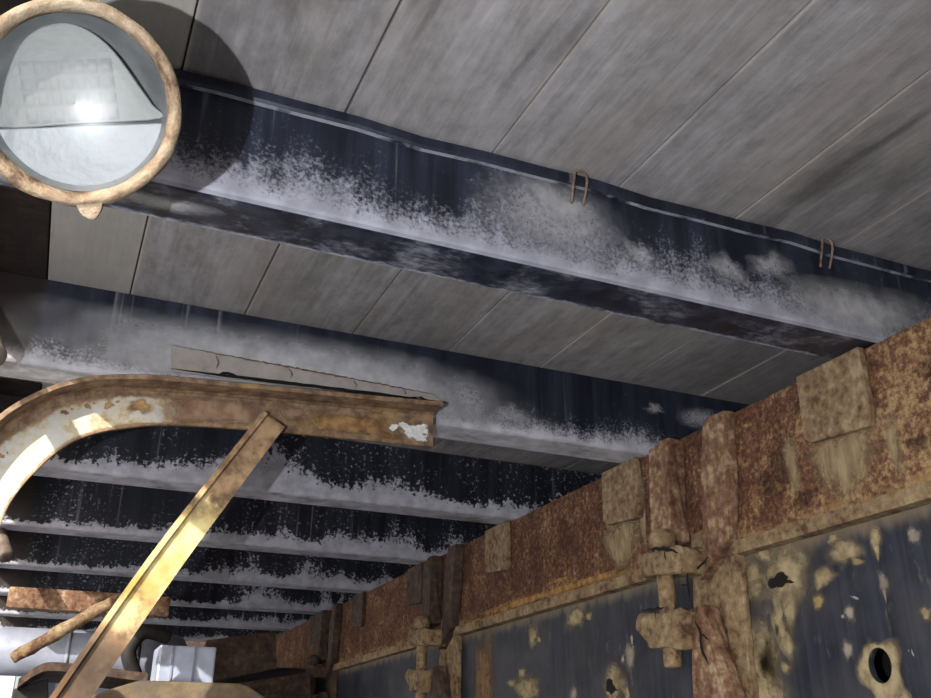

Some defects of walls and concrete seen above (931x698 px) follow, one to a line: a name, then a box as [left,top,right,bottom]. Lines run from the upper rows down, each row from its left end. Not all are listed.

peeling [389,422,428,442]
corrosion [815,432,866,491]
corrosion [489,482,646,615]
corrosion [828,535,863,565]
corrosion [870,528,881,561]
hole [767,572,794,589]
corrosion [813,568,835,609]
corrosion [745,548,807,698]
corrosion [508,667,538,698]
spalling [606,678,618,694]
corrosion [606,635,634,698]
corrosion [844,641,910,698]